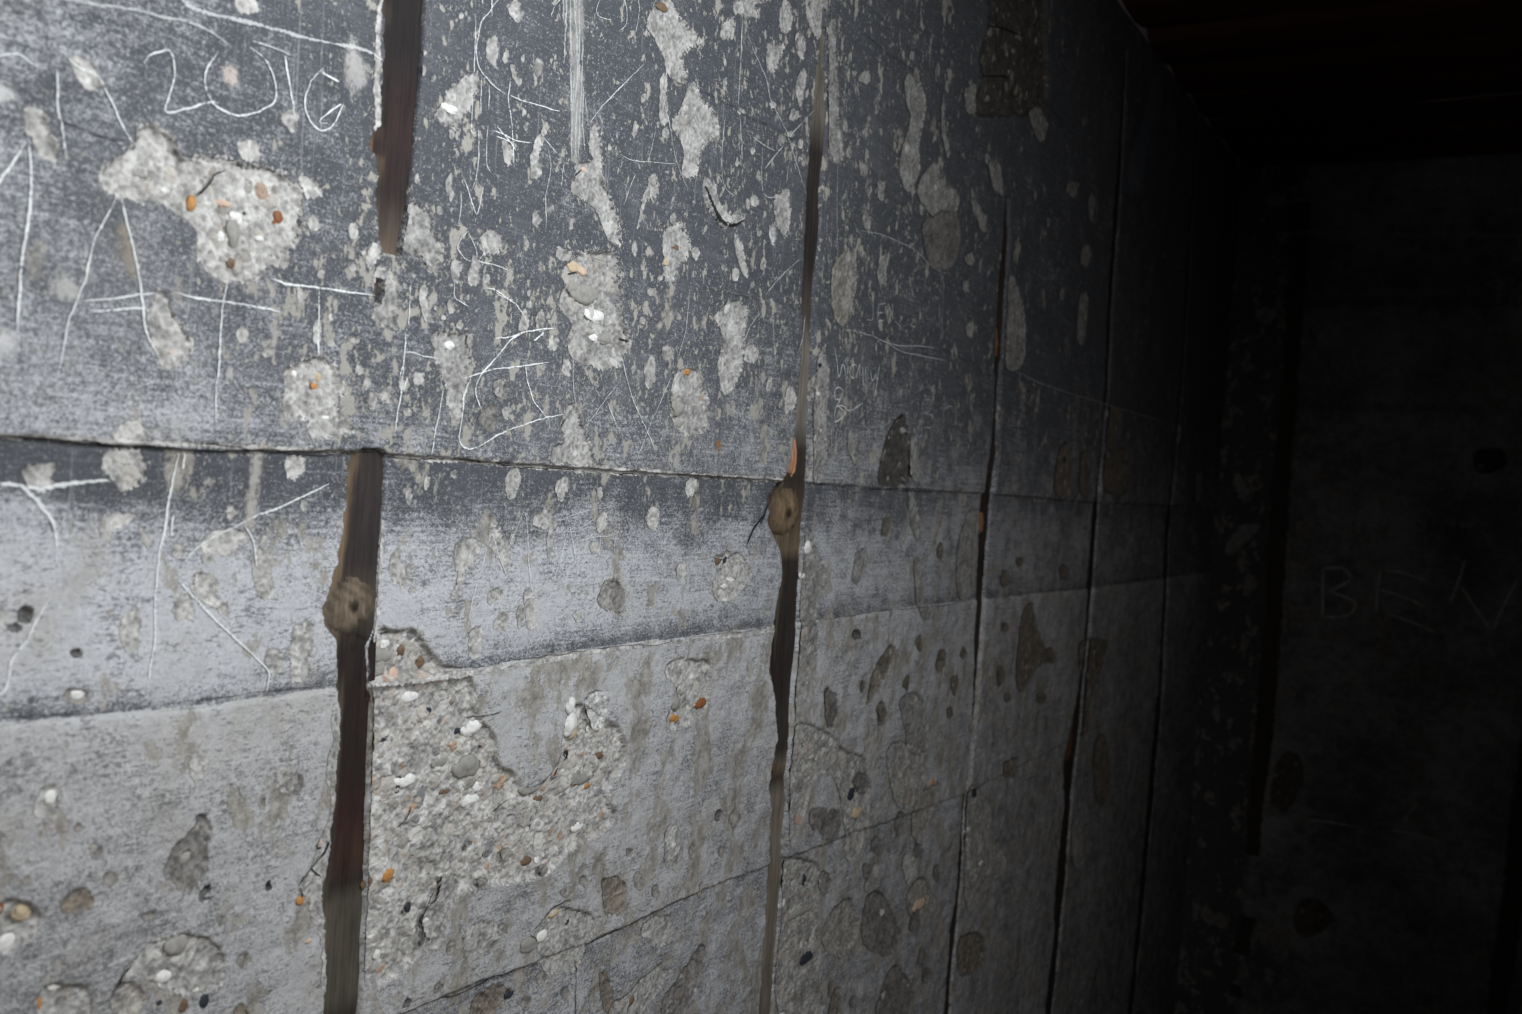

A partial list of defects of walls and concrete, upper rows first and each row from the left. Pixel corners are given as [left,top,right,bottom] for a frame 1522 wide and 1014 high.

spalling [96,117,323,286]
spalling [0,172,512,543]
spalling [518,118,660,377]
spalling [643,187,792,438]
spalling [765,351,830,489]
spalling [34,783,61,821]
spalling [0,823,119,955]
spalling [360,520,775,1014]